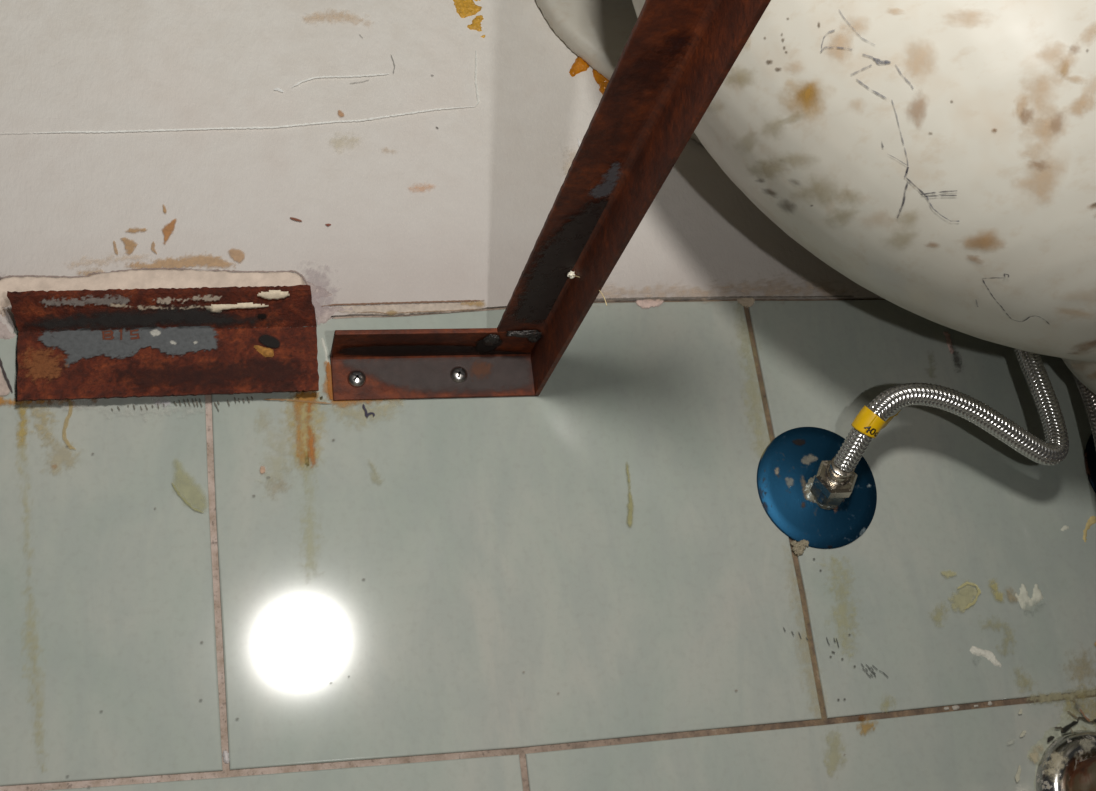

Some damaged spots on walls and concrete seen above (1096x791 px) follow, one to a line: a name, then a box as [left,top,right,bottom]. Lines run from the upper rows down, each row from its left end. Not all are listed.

spalling [0,359,13,396]
corrosion [0,397,74,442]
corrosion [264,362,371,464]
crack [1047,708,1096,742]